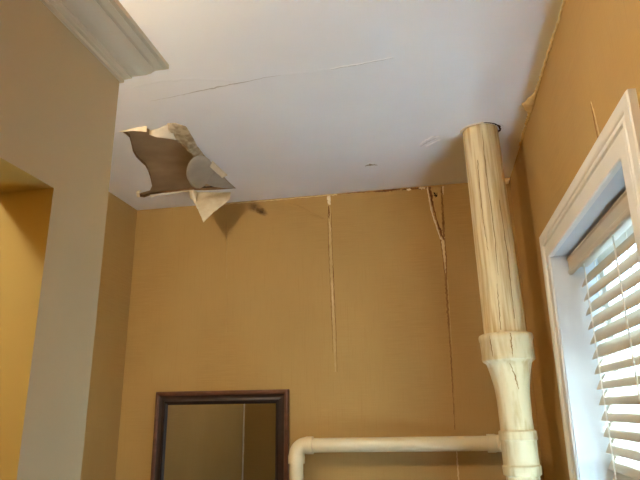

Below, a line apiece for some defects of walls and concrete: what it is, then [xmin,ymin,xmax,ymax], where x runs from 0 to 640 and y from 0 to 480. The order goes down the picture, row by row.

crack [477,135,519,389]